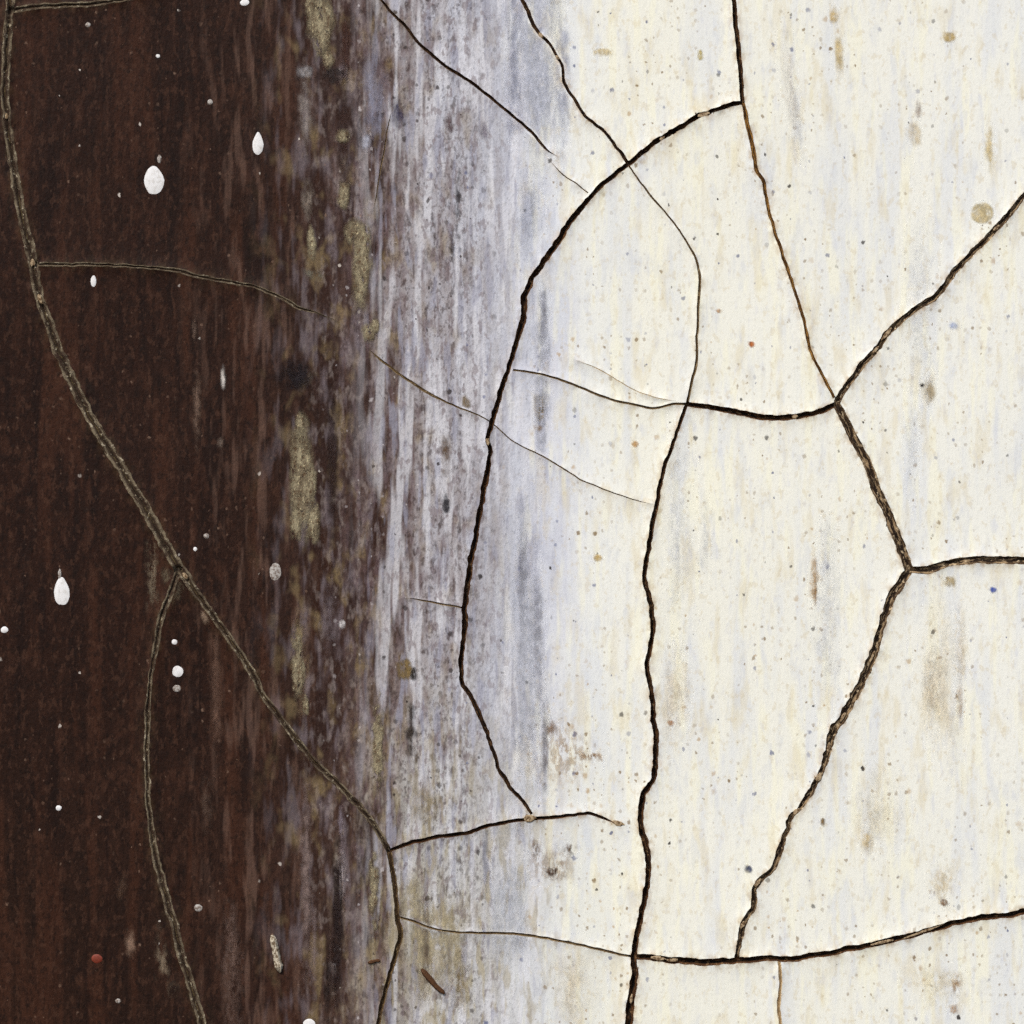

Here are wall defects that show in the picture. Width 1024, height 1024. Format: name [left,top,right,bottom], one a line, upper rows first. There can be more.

water stain [301,816,310,932]
crack [0,0,625,1024]
water stain [536,301,549,450]
crack [368,0,1024,1024]